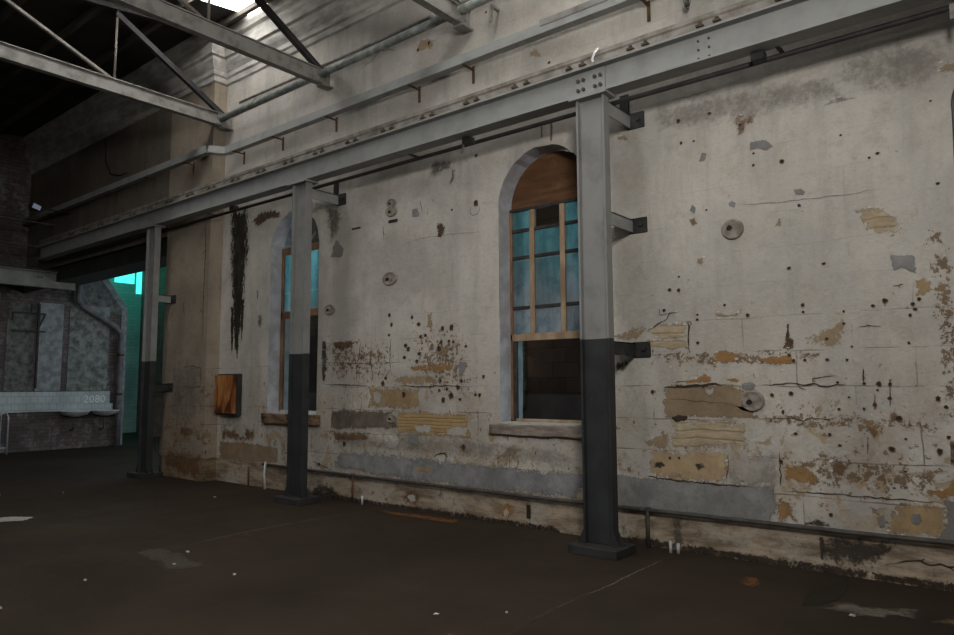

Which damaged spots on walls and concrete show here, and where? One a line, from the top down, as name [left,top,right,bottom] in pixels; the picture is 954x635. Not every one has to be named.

leakage [229,206,252,358]
spalling [323,311,483,441]
spalling [614,320,936,483]
peeling [856,206,903,237]
peeling [915,230,954,418]
spalling [776,447,954,538]